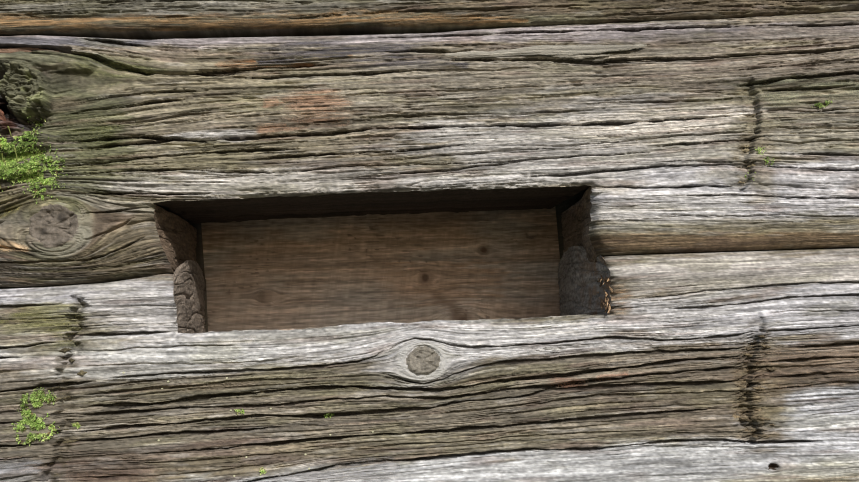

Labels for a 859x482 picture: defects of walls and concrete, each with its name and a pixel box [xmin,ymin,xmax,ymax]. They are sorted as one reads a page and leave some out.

crack [0,342,54,359]
crack [0,381,92,392]
crack [78,325,859,454]
crack [0,444,30,460]
crack [246,438,811,482]